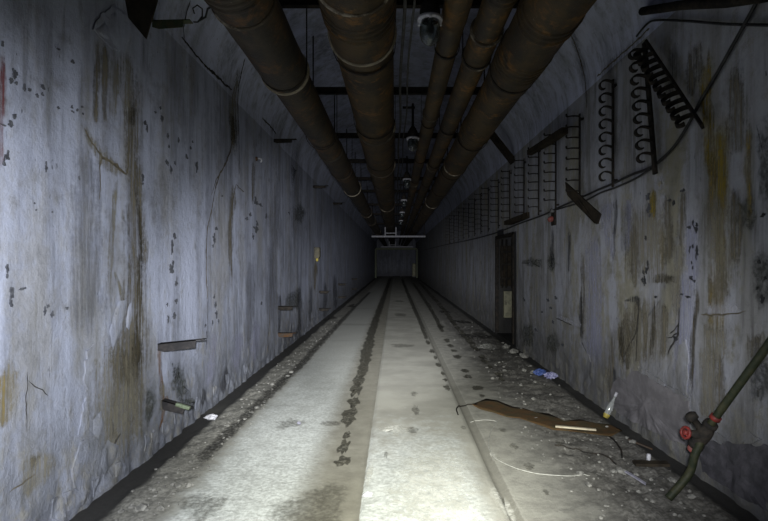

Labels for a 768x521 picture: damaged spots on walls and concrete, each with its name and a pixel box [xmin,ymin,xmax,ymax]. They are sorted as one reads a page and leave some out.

crack [84,128,131,199]
crack [182,0,245,343]
water stain [93,46,150,433]
water stain [579,181,673,396]
crack [668,310,680,354]
water stain [706,193,766,301]
crack [25,372,47,427]